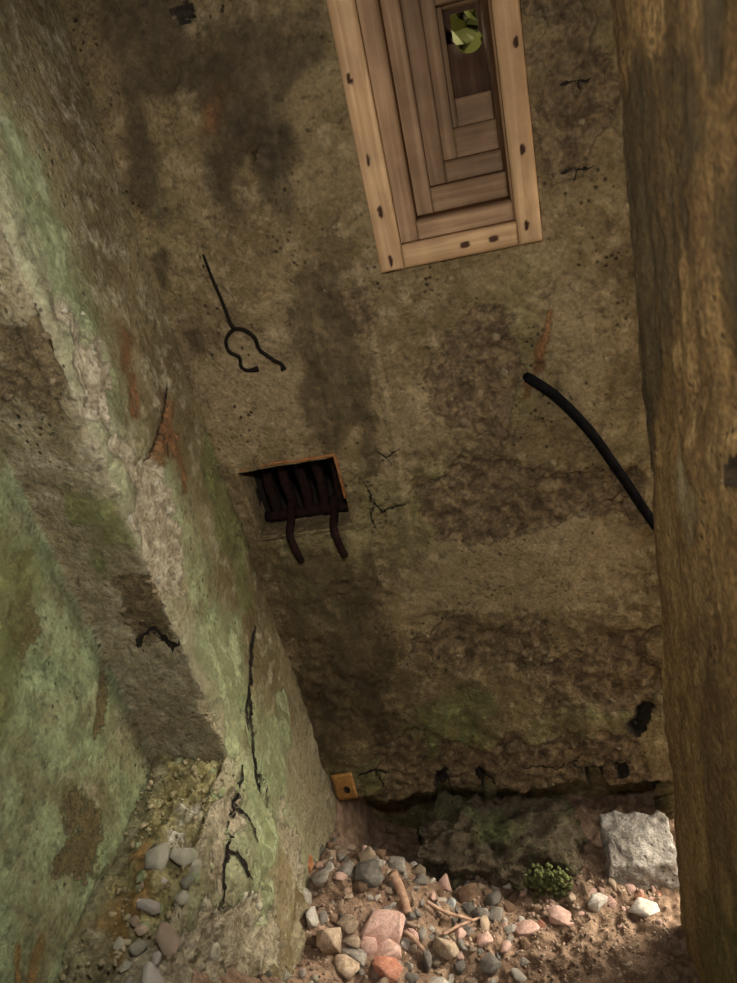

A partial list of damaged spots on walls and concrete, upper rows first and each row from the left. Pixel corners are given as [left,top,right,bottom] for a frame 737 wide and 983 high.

corrosion [119,325,140,418]
corrosion [239,453,347,499]
crack [135,626,180,652]
crack [217,625,269,910]